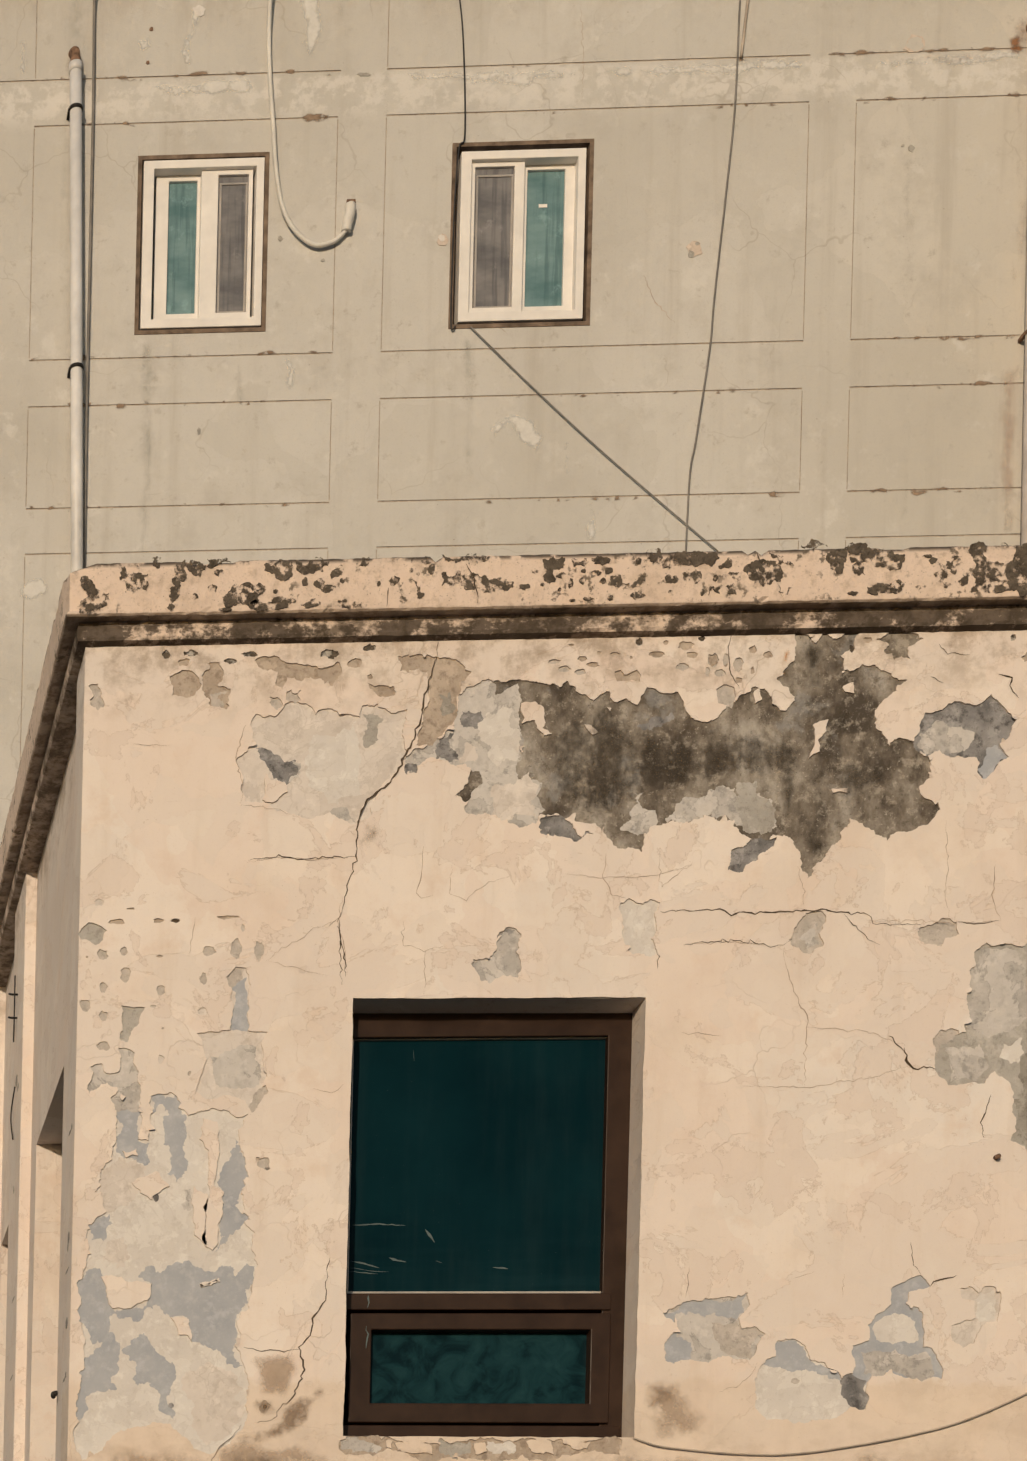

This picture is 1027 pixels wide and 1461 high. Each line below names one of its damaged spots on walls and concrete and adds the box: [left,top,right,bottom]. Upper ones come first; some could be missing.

crack [236,725,284,812]
crack [251,644,438,979]
spalling [162,633,1018,878]
damp [558,714,794,803]
peeling [918,919,958,946]
spalling [933,941,1027,1150]
peeling [63,899,270,1460]
damp [262,1359,292,1409]
peeling [662,1276,943,1424]
peeling [951,1286,1001,1348]
damp [222,1446,310,1461]
spalling [339,1435,623,1461]